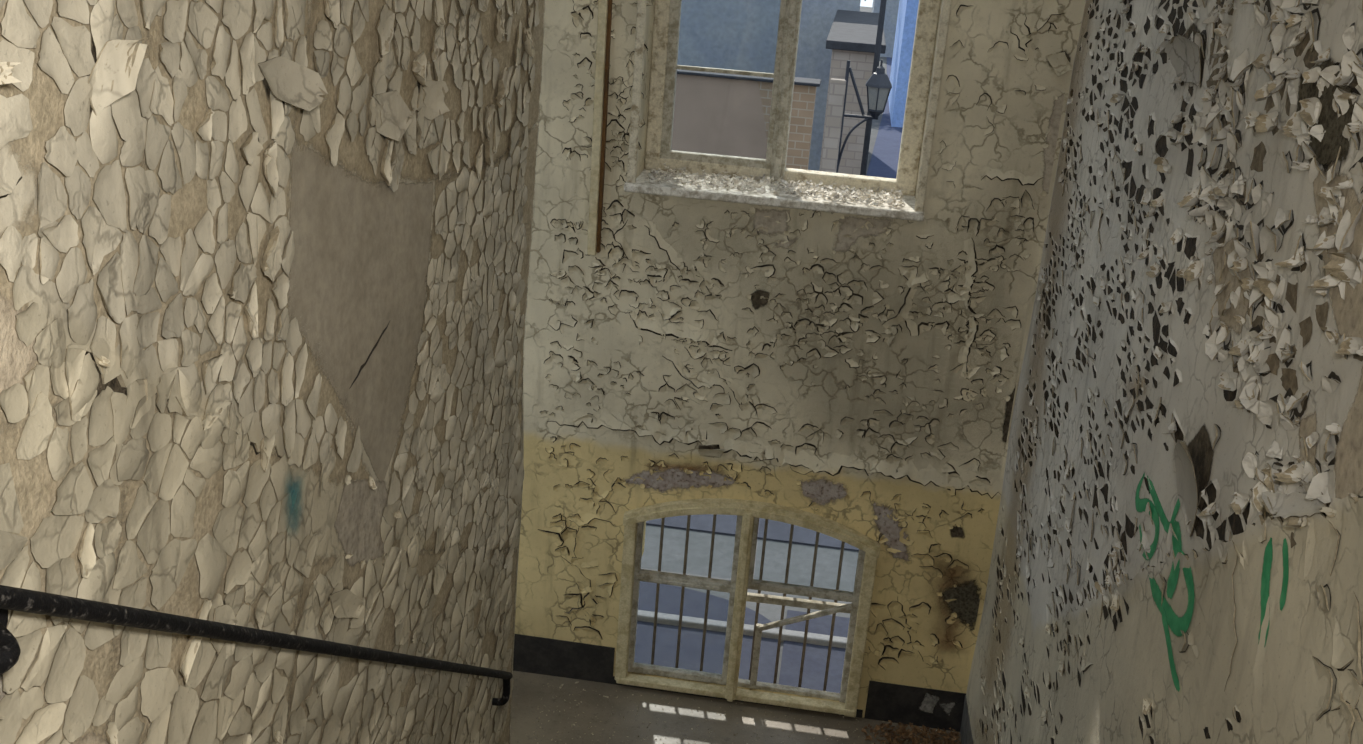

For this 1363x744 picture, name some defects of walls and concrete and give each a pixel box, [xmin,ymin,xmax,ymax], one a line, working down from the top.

peeling [0,0,545,744]
crack [561,496,618,628]
crack [1065,495,1363,744]